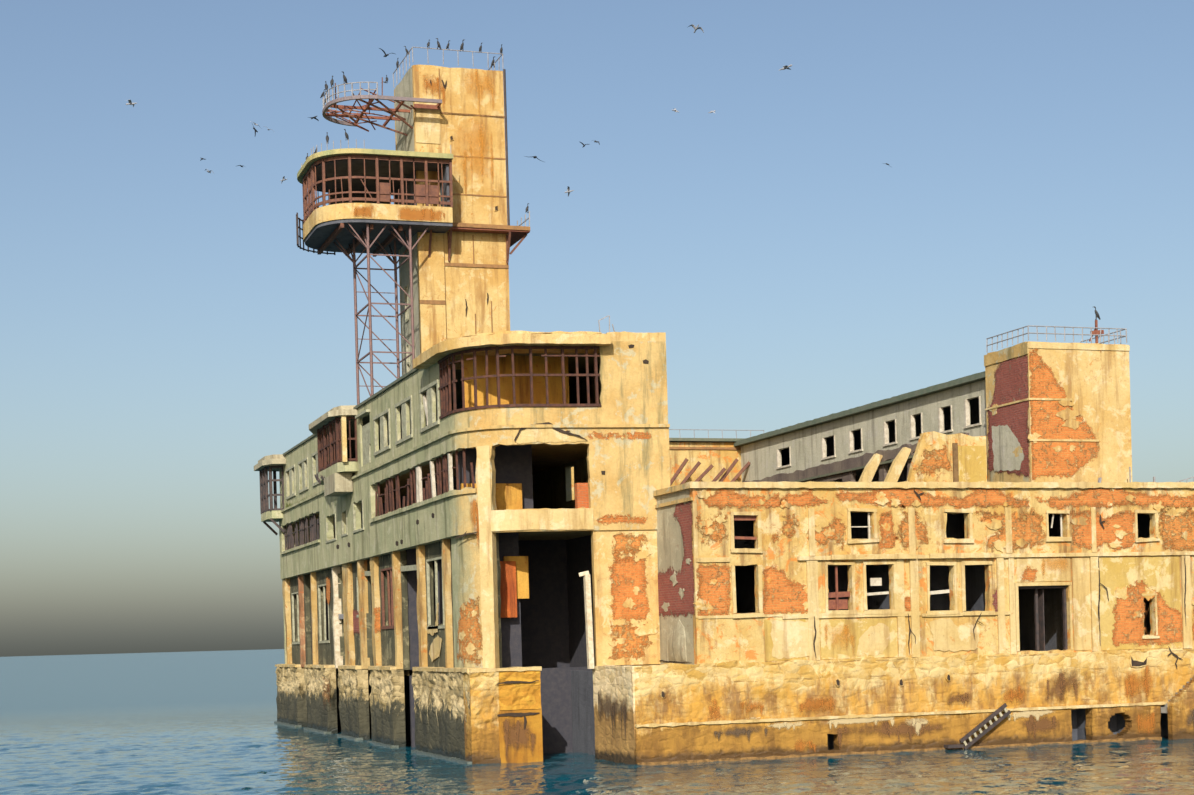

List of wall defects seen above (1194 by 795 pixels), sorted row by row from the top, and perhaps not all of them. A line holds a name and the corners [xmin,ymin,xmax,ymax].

peeling [987,350,1100,480]
peeling [596,441,1194,668]
peeling [457,597,483,666]
leakage [279,674,357,700]
leakage [421,687,467,730]
leakage [714,717,802,740]
leakage [828,716,942,746]
leakage [1008,710,1057,739]